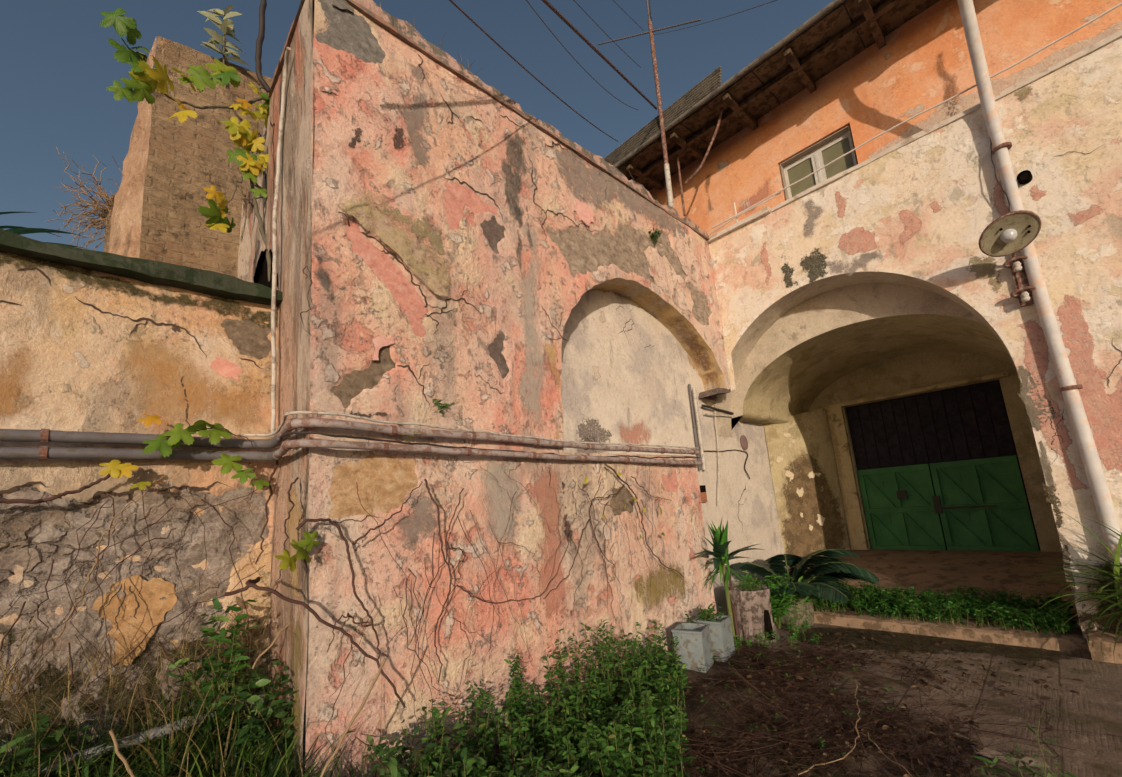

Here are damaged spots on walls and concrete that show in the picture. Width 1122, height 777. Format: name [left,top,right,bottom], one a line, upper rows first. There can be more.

flaking render [315,0,386,64]
crack [418,54,598,237]
flaking render [547,199,712,325]
crack [18,267,207,358]
flaking render [330,336,396,408]
peeling [1018,322,1087,528]
peeling [1057,295,1122,470]
crack [0,481,46,495]
crack [78,481,230,505]
crack [297,479,307,583]
crack [104,581,140,631]
flaking render [1060,545,1095,631]